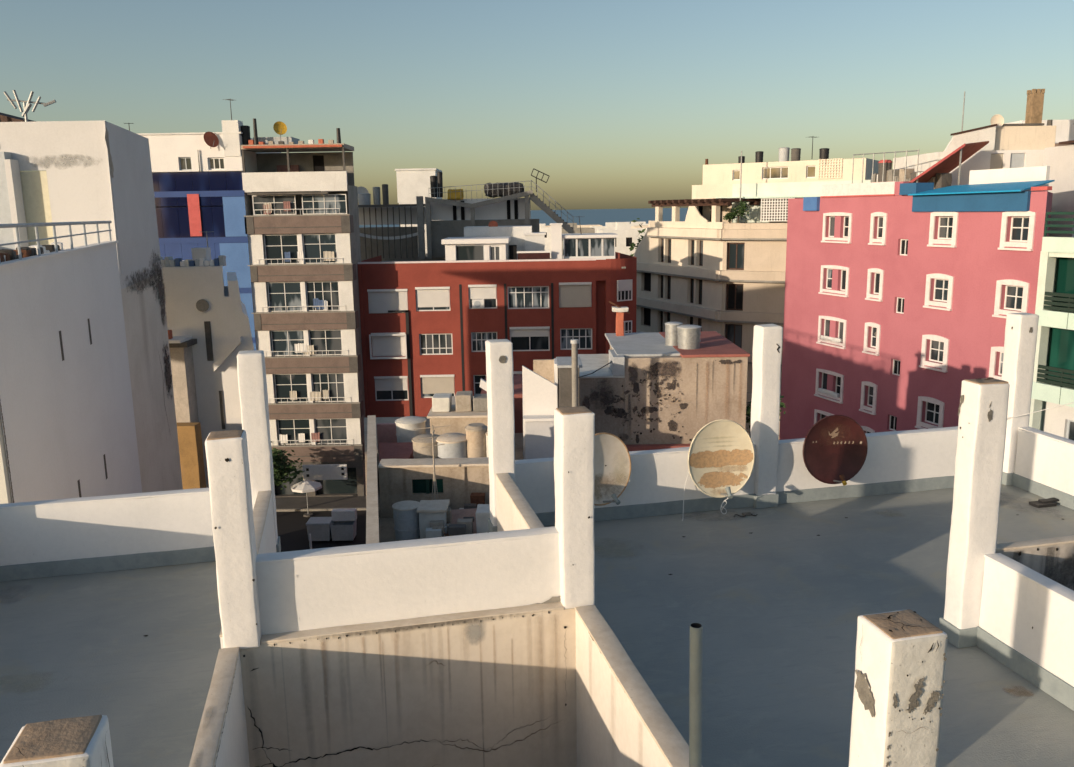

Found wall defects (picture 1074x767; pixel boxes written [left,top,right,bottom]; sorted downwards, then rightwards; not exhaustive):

leakage [127,253,165,325]
leakage [1045,548,1074,587]
leakage [359,618,481,639]
crack [215,656,558,767]
peeling [855,670,875,717]
peeling [892,675,945,723]